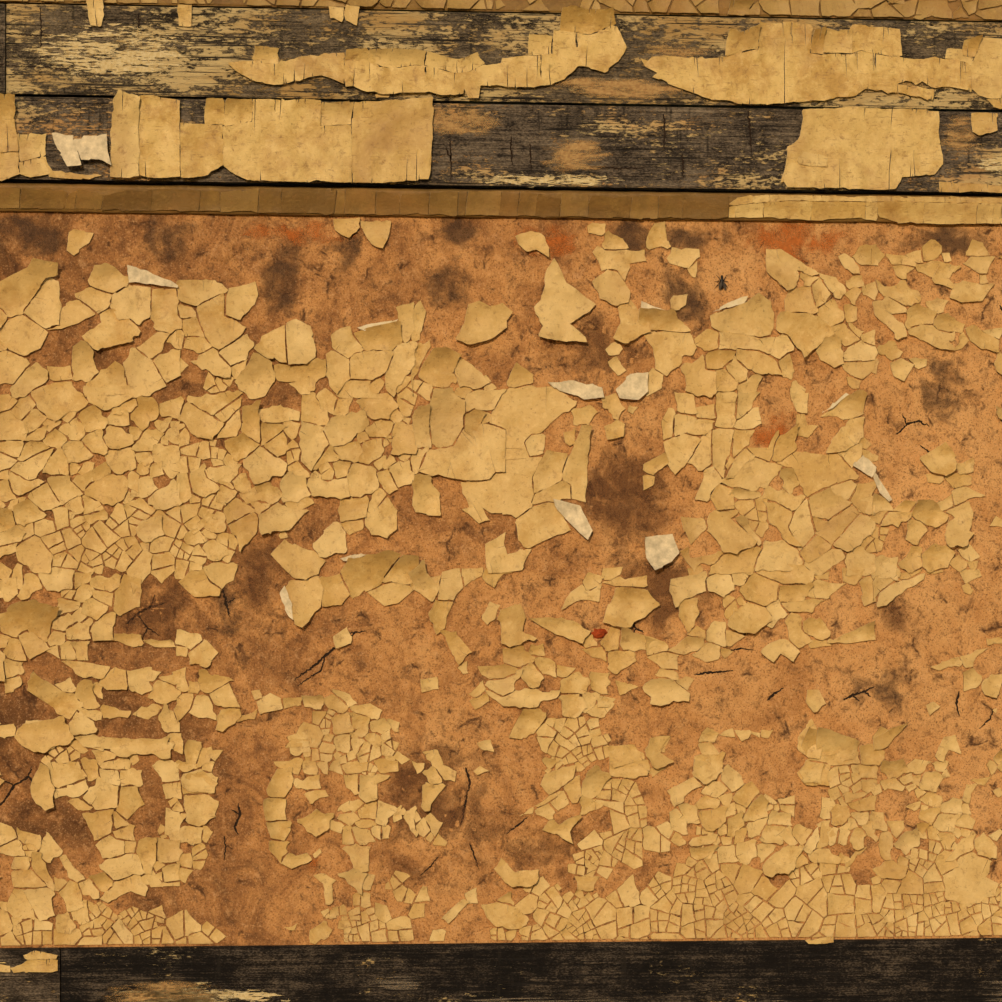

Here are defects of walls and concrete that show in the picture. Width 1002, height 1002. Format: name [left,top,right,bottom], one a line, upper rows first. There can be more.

peeling [0,0,719,183]
peeling [640,0,1002,135]
peeling [781,106,943,190]
peeling [0,181,1002,973]
crack [843,687,874,701]
crack [955,692,994,729]
crack [0,767,32,806]
crack [224,804,241,859]
crack [460,767,479,869]